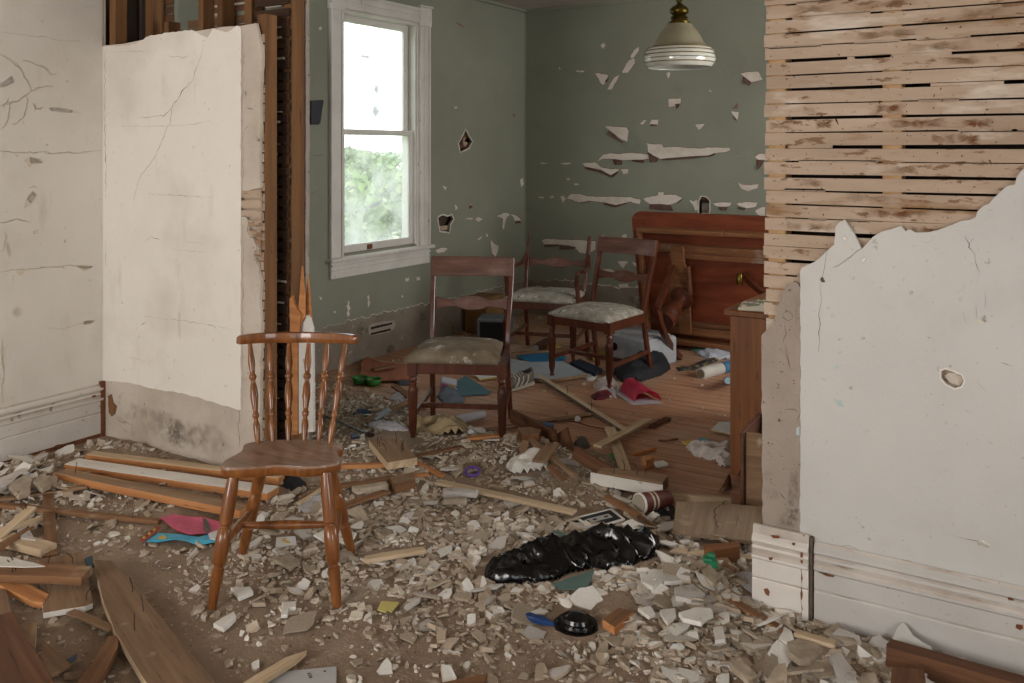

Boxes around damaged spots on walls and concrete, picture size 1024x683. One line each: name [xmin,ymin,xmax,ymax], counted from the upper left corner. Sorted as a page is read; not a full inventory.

peeling [576,47,639,90]
crack [0,32,144,197]
crack [134,38,207,197]
peeling [668,98,681,109]
spalling [458,129,473,153]
peeling [583,126,731,178]
peeling [538,178,766,216]
spalling [437,203,483,234]
peeling [497,212,521,230]
flaking render [92,23,265,466]
spalling [940,368,966,390]